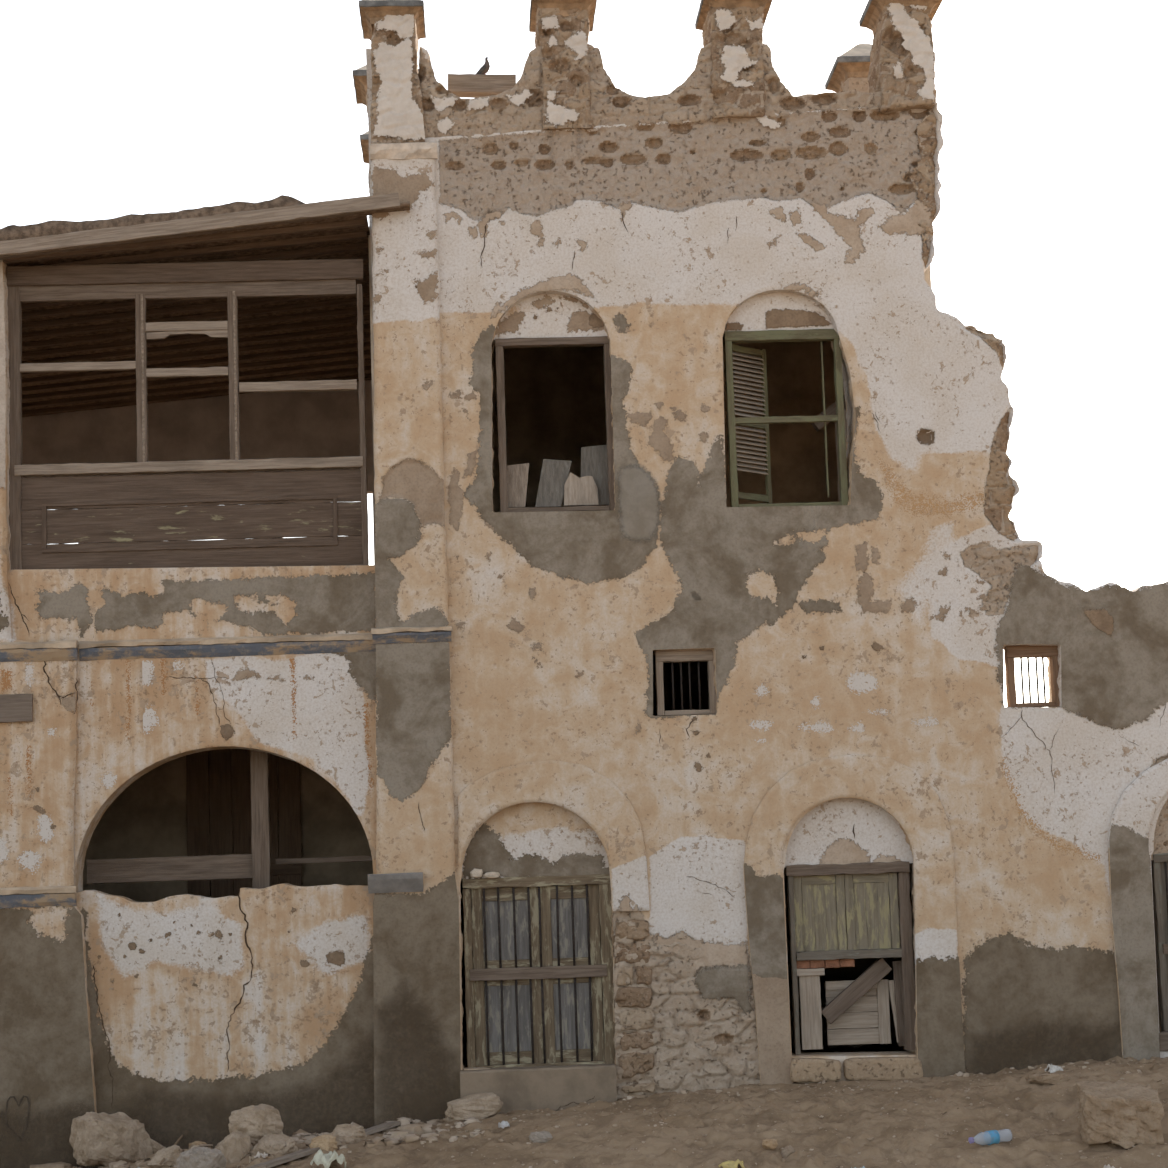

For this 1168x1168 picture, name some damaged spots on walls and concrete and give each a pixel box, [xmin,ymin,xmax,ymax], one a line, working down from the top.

flaking render [372,3,937,305]
flaking render [966,328,1004,371]
flaking render [448,390,477,419]
flaking render [379,450,478,531]
peeling [34,583,93,638]
crack [43,661,78,714]
crack [173,660,231,724]
crack [226,894,253,1072]
flaking render [612,893,794,1100]